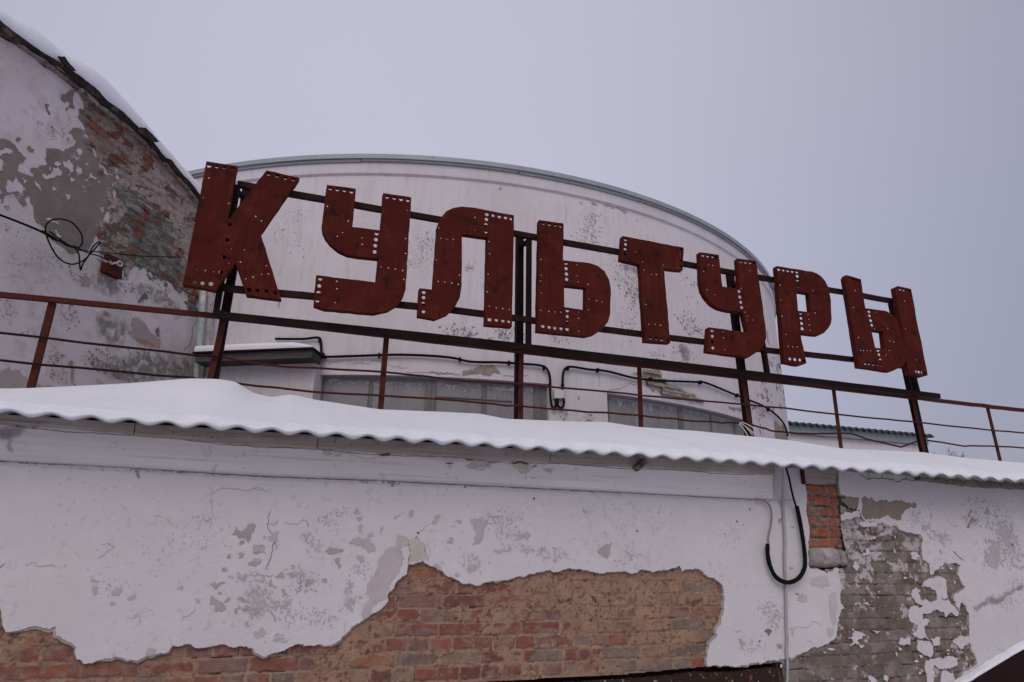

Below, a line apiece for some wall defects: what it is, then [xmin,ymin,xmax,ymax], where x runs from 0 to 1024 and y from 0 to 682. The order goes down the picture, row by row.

flaking render [0,89,200,311]
crack [0,424,133,436]
flaking render [634,369,703,421]
flaking render [0,506,722,682]
crack [163,438,754,577]
flaking render [737,496,974,682]
peeling [958,493,1024,611]